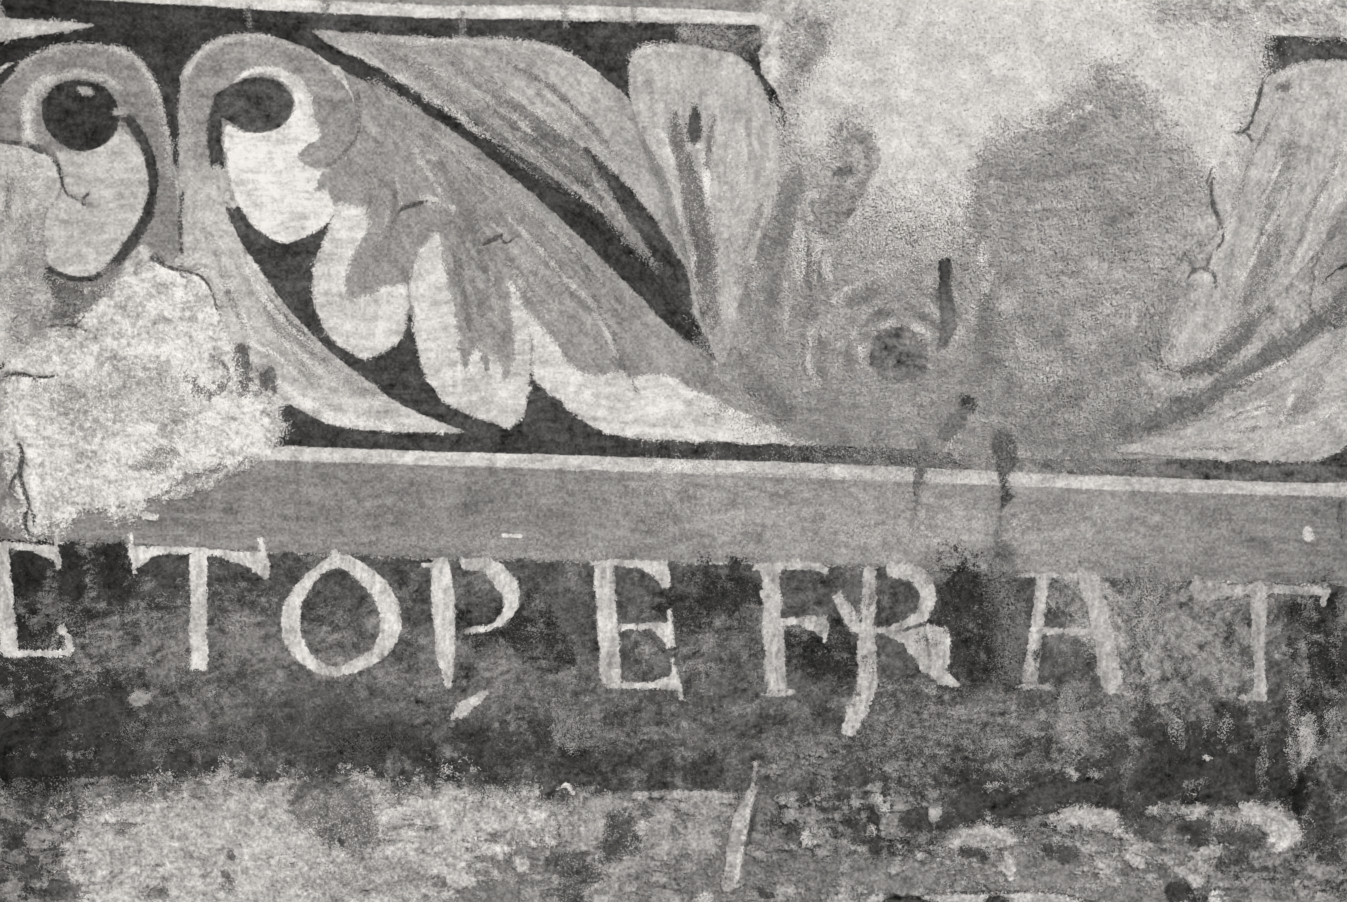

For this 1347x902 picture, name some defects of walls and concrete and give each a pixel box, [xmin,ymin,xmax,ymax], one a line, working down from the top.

flaking render [0,203,295,548]
leakage [904,44,1227,693]
crack [9,441,36,537]
leakage [1038,548,1234,804]
leakage [1222,610,1237,650]
leakage [1328,591,1347,687]
flaking render [0,727,1347,902]